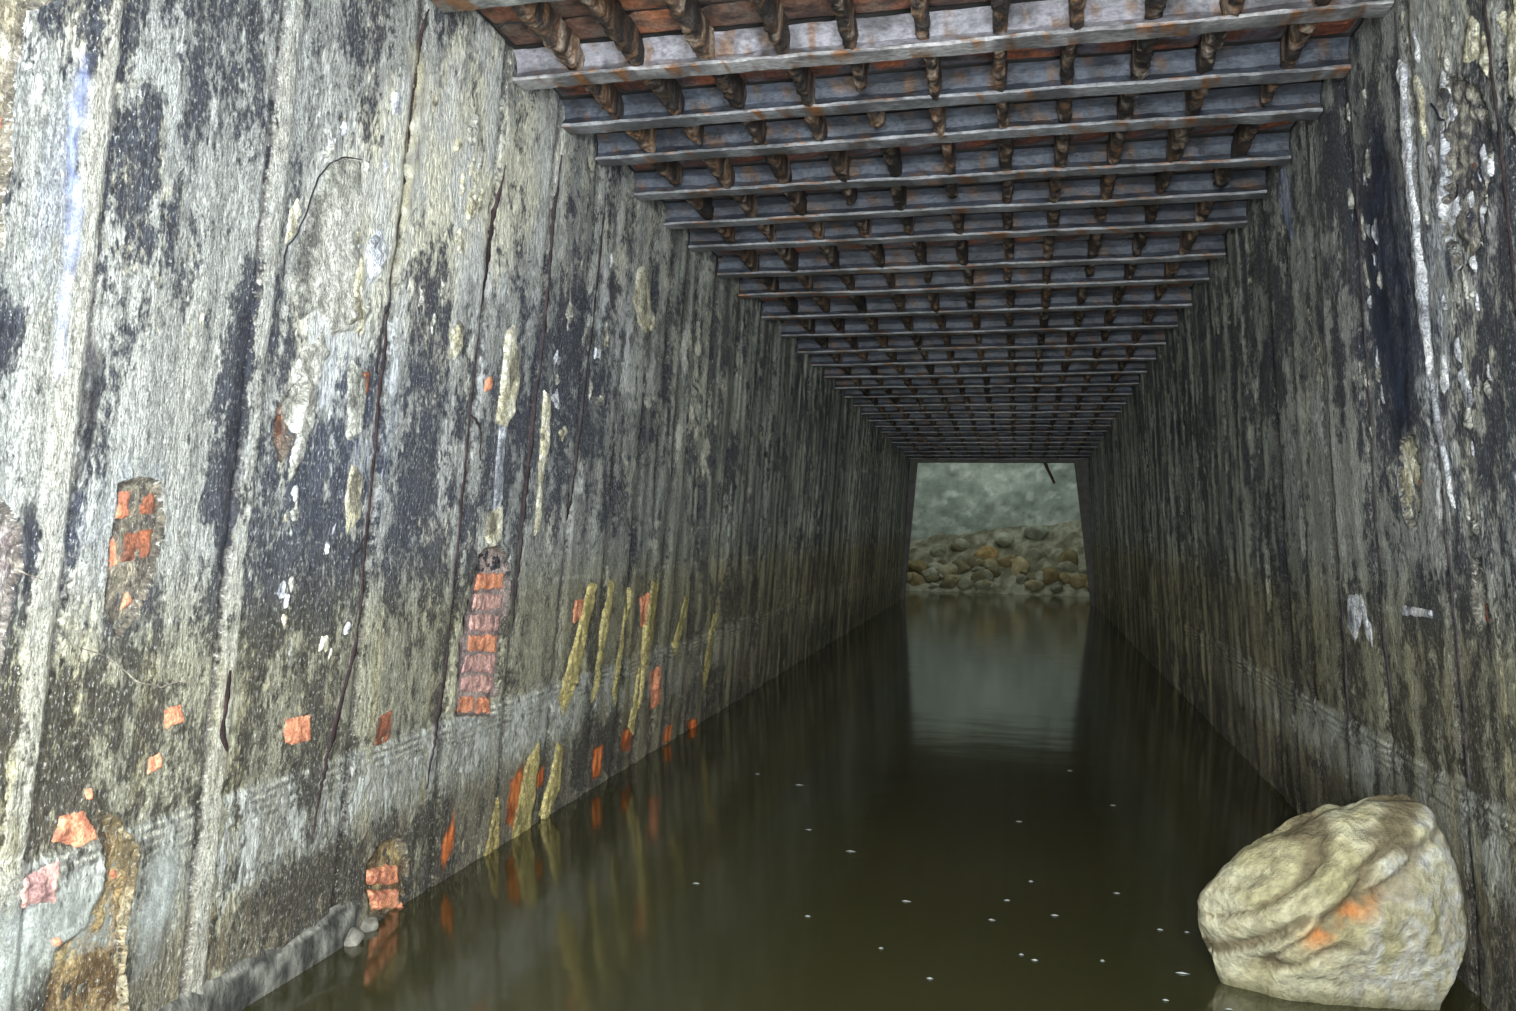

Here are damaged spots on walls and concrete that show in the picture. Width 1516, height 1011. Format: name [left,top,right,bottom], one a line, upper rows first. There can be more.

flaking render [0,0,52,249]
crack [1392,12,1400,64]
crack [1430,103,1445,121]
crack [1483,0,1516,315]
flaking render [566,301,609,360]
flaking render [104,476,166,638]
flaking render [455,325,520,718]
flaking render [534,349,568,536]
crack [1441,474,1471,780]
flaking render [20,861,60,909]
flaking render [43,788,141,1011]
flaking render [365,835,410,918]